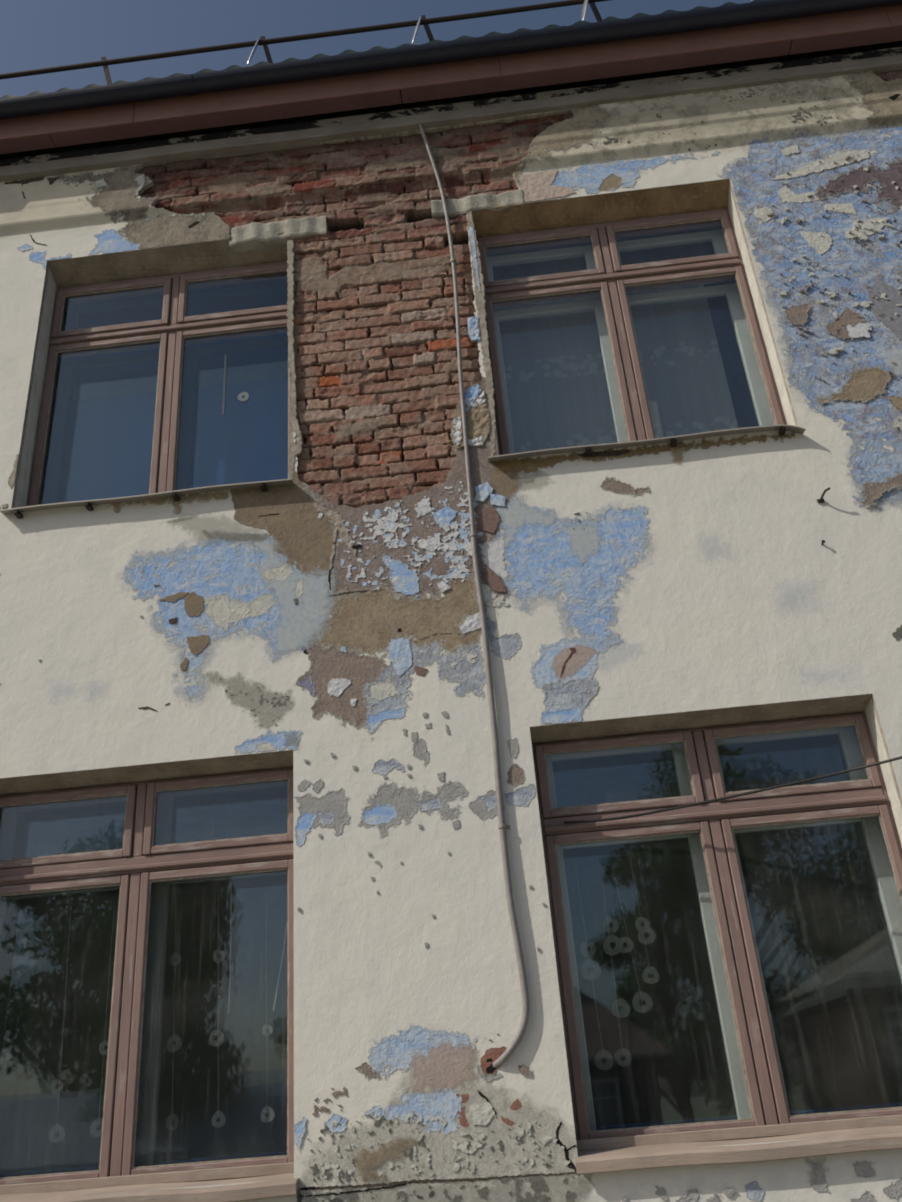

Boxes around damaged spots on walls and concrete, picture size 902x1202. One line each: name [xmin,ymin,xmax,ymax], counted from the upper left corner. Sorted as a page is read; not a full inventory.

peeling [17,234,72,269]
flaking render [52,71,902,846]
peeling [294,1024,575,1186]
crack [297,1122,579,1202]
spalling [653,1181,764,1202]
spalling [810,1161,829,1192]
spalling [851,1161,902,1202]